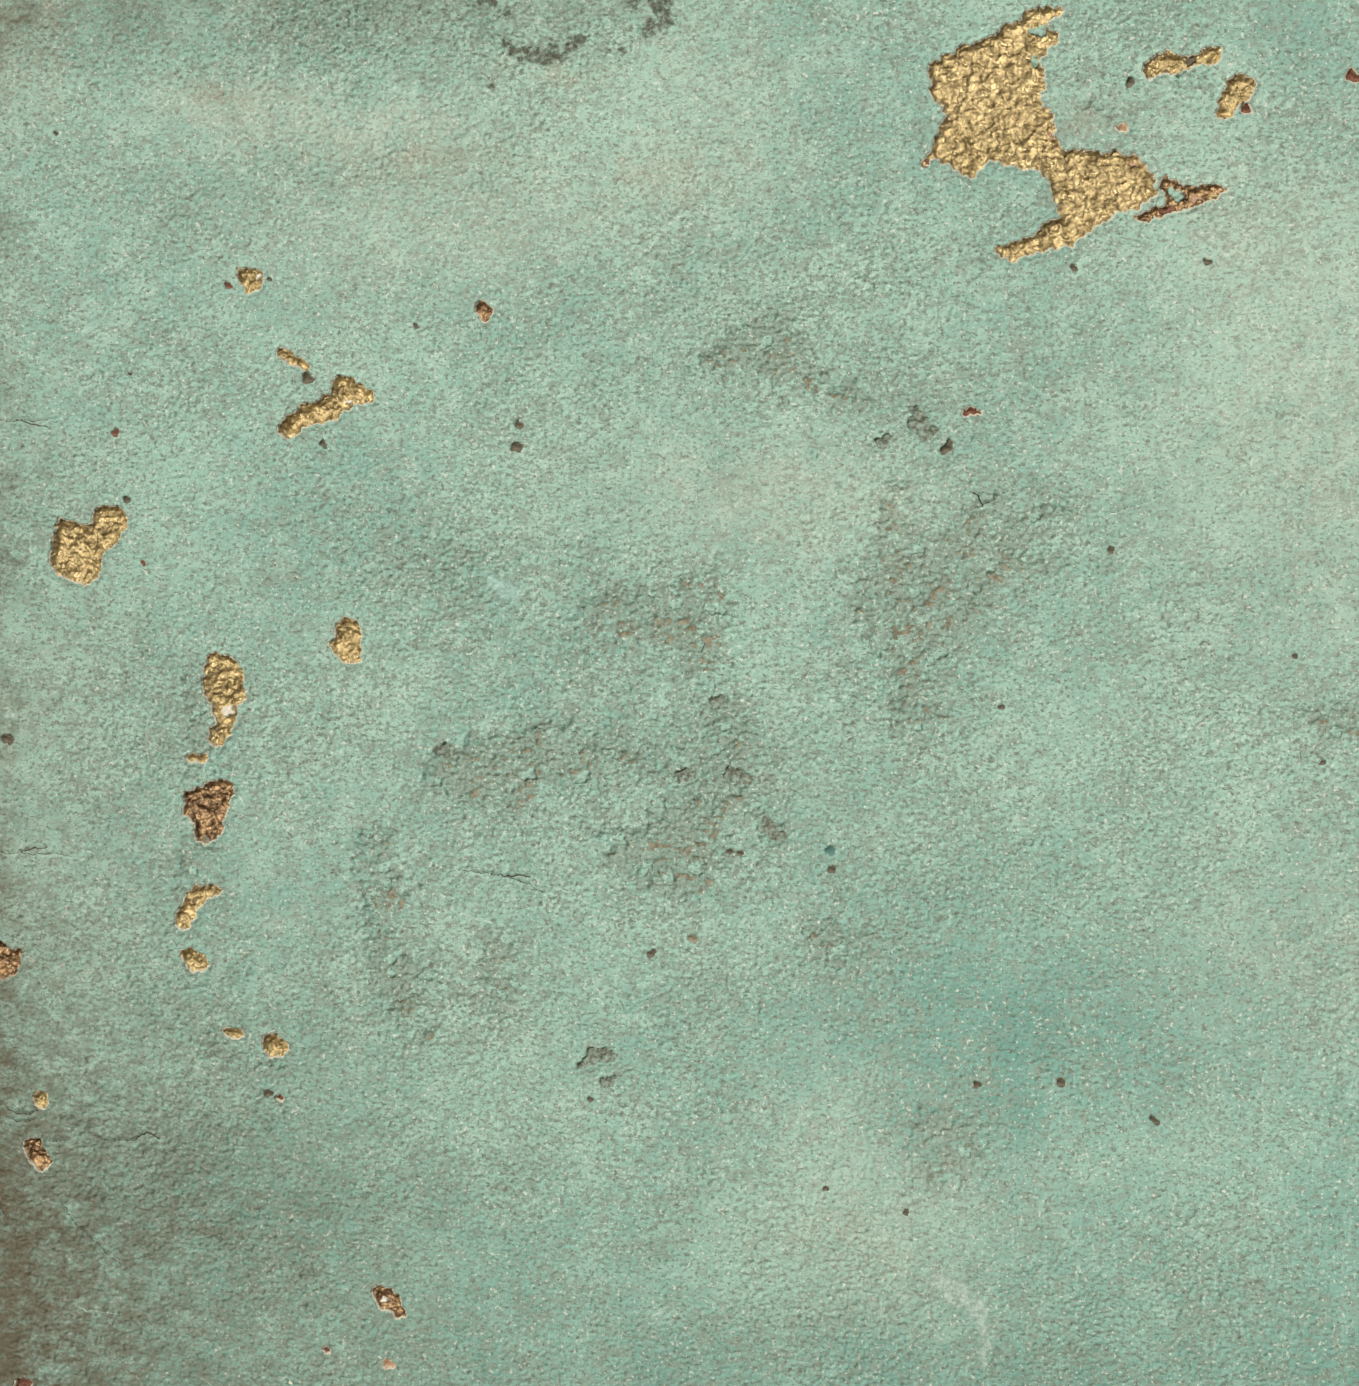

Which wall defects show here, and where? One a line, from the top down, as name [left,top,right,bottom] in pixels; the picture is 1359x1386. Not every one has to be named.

spalling [921,5,1229,273]
spalling [1215,73,1257,120]
spalling [276,347,375,449]
spalling [48,496,132,587]
spalling [181,651,247,845]
spalling [0,940,23,980]